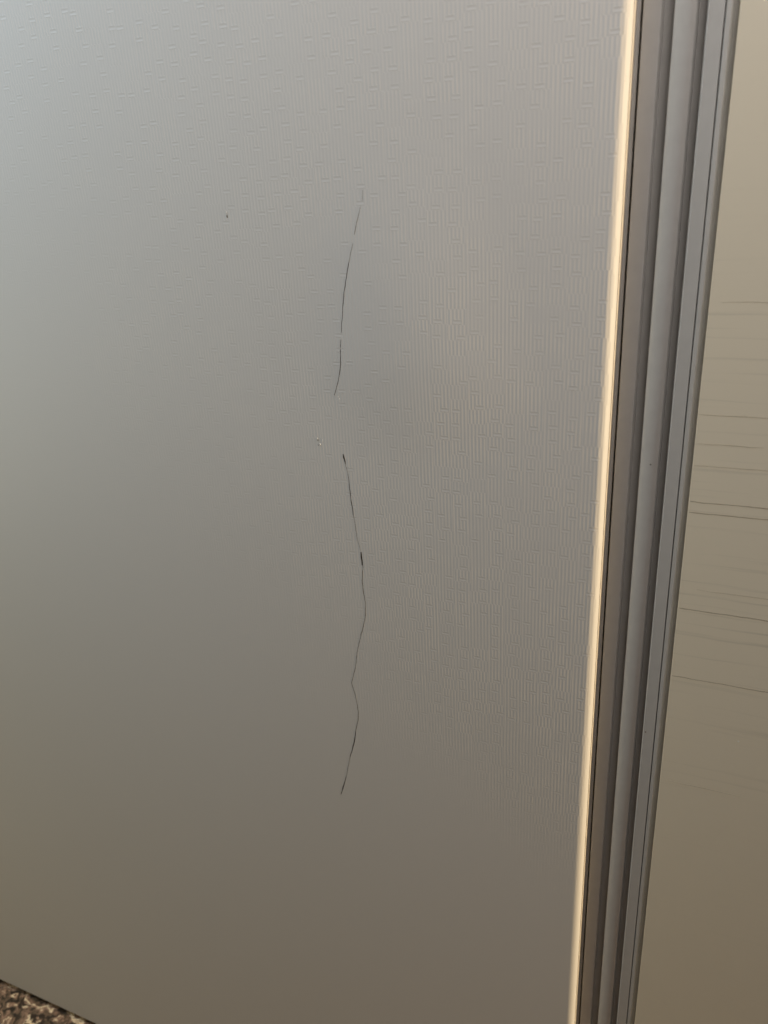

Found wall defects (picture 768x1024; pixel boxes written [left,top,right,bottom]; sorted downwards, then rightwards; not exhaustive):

crack [334,197,363,395]
crack [341,454,366,794]